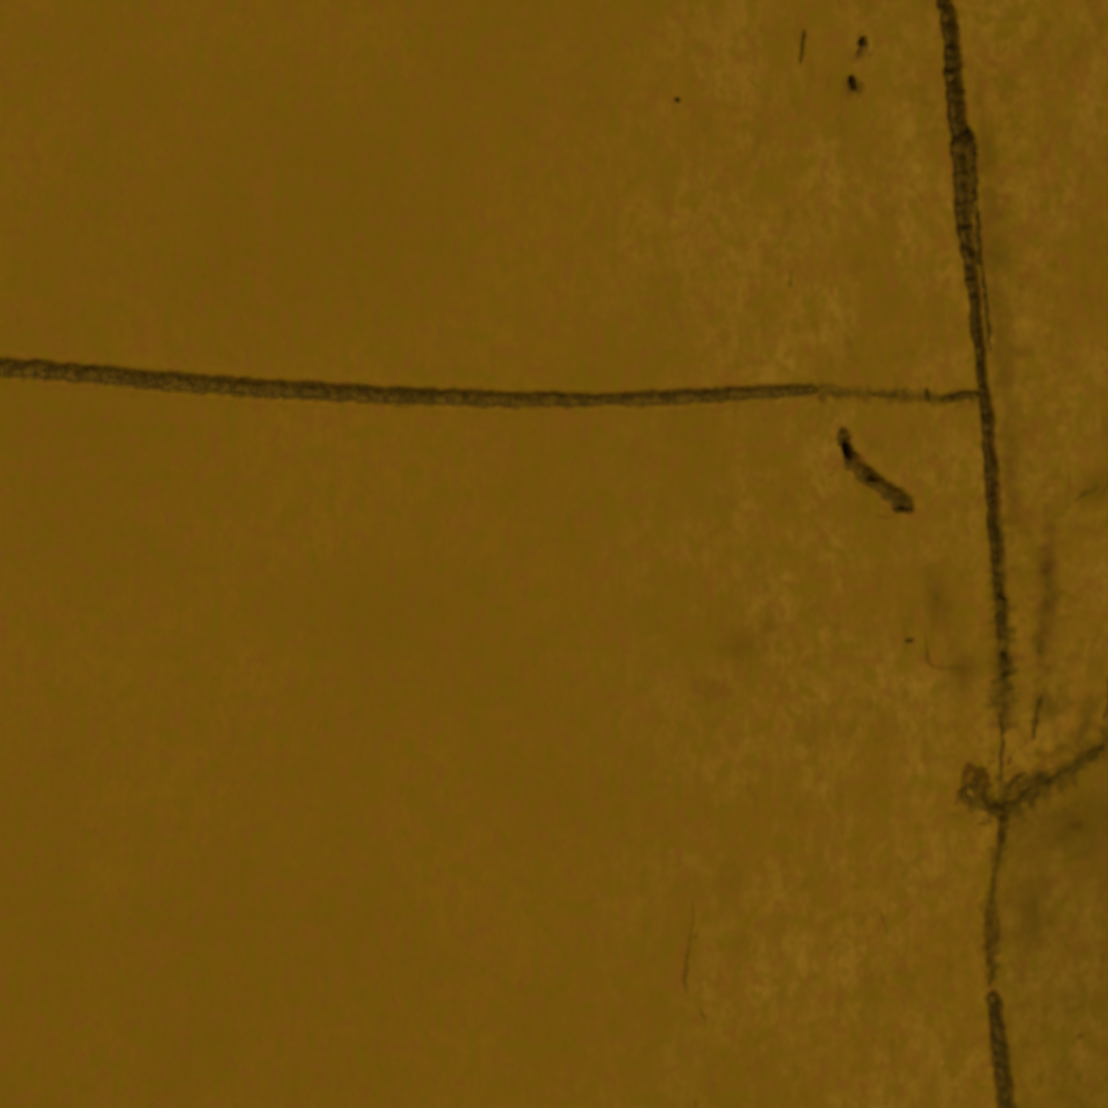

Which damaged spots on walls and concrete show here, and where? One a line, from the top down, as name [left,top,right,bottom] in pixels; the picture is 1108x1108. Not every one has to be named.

crack [0,359,818,408]
crack [925,0,1044,739]
crack [1018,708,1108,802]
crack [976,881,1013,1108]